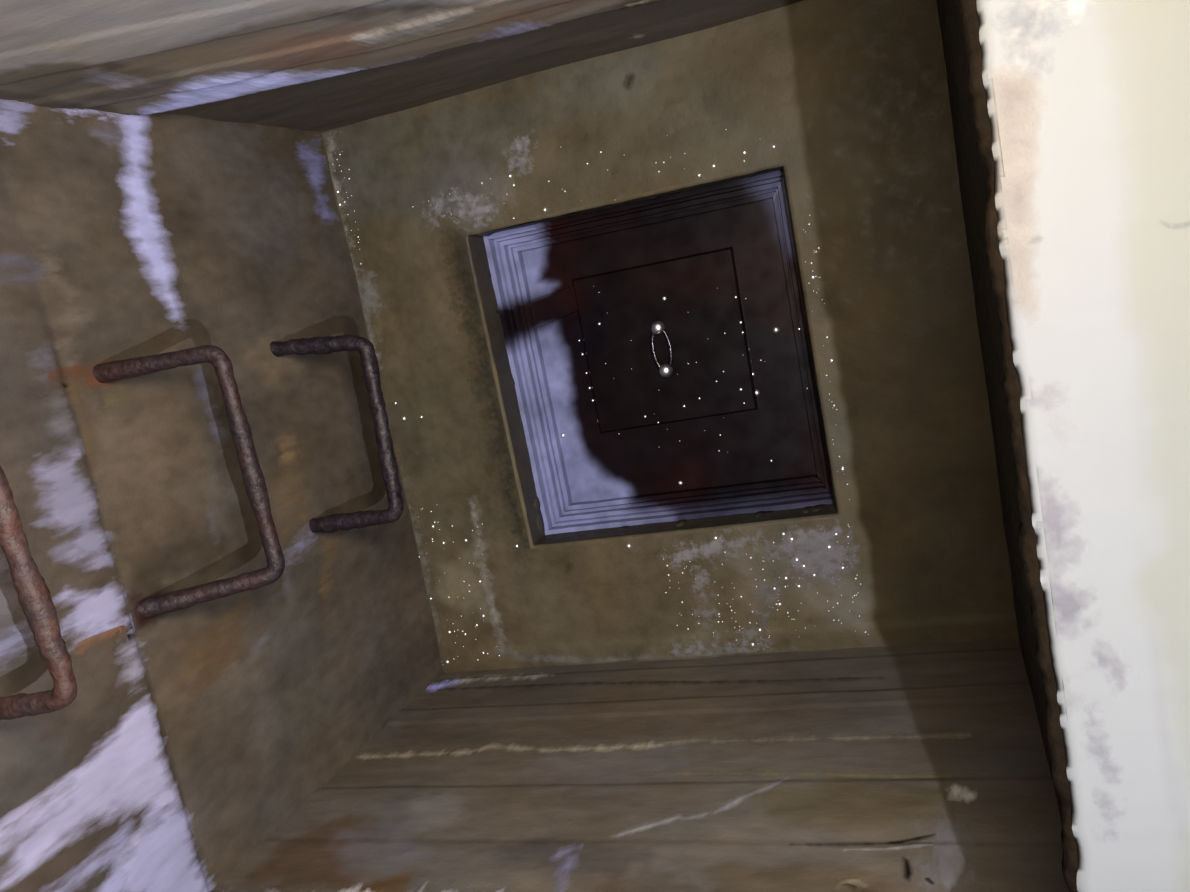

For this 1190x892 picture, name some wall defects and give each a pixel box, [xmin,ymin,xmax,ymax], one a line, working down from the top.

efflorescence [0,99,34,134]
efflorescence [65,64,390,318]
efflorescence [662,520,859,657]
efflorescence [0,696,212,892]
efflorescence [552,845,582,892]